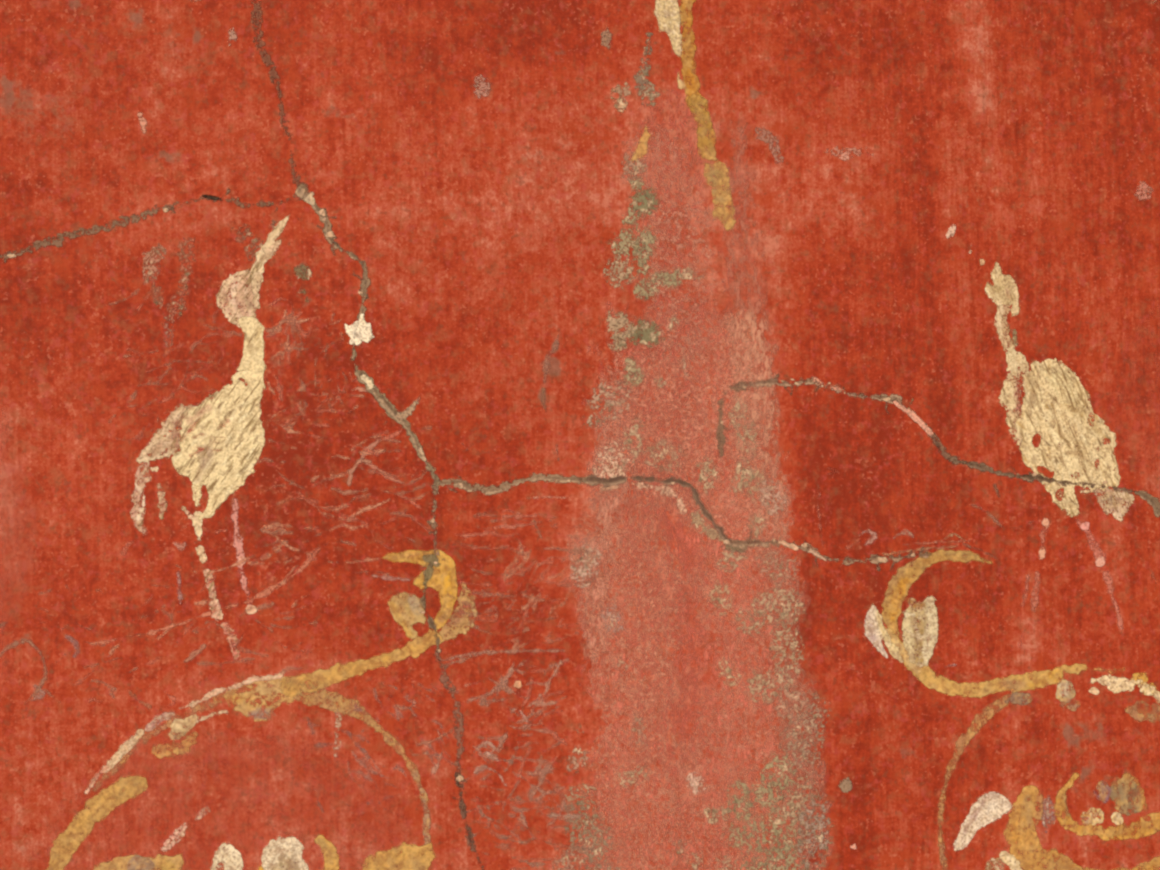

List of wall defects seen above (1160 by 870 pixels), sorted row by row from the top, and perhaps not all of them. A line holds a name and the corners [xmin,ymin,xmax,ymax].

crack [0,0,371,319]
peeling [603,152,702,300]
crack [351,343,932,870]
damp [567,94,832,870]
crack [716,374,1160,517]